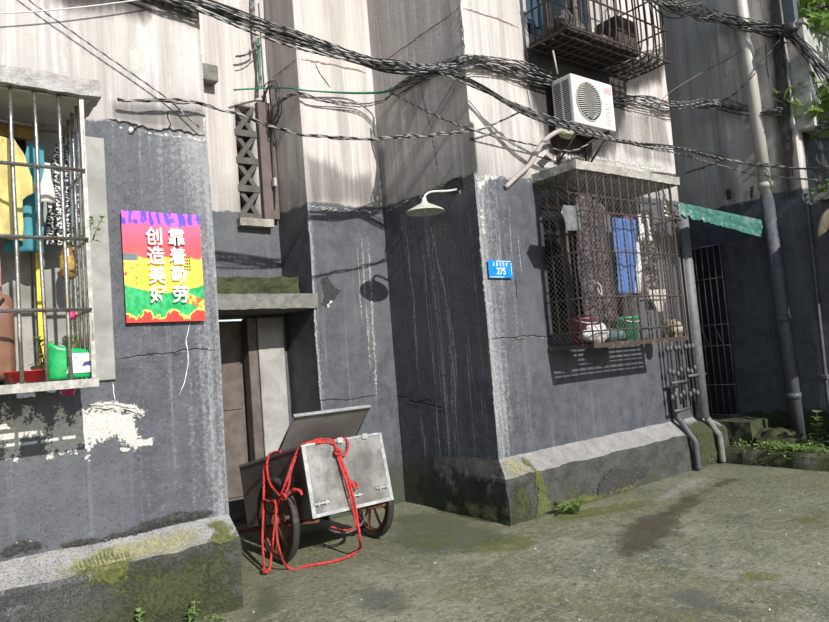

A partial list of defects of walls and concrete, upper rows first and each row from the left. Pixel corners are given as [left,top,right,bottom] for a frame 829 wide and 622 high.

crack [116,348,215,362]
peeling [321,276,340,307]
water stain [357,238,377,397]
water stain [421,215,460,459]
crack [487,333,556,341]
peeling [0,402,154,463]
crack [397,395,445,412]
water stain [621,478,702,556]